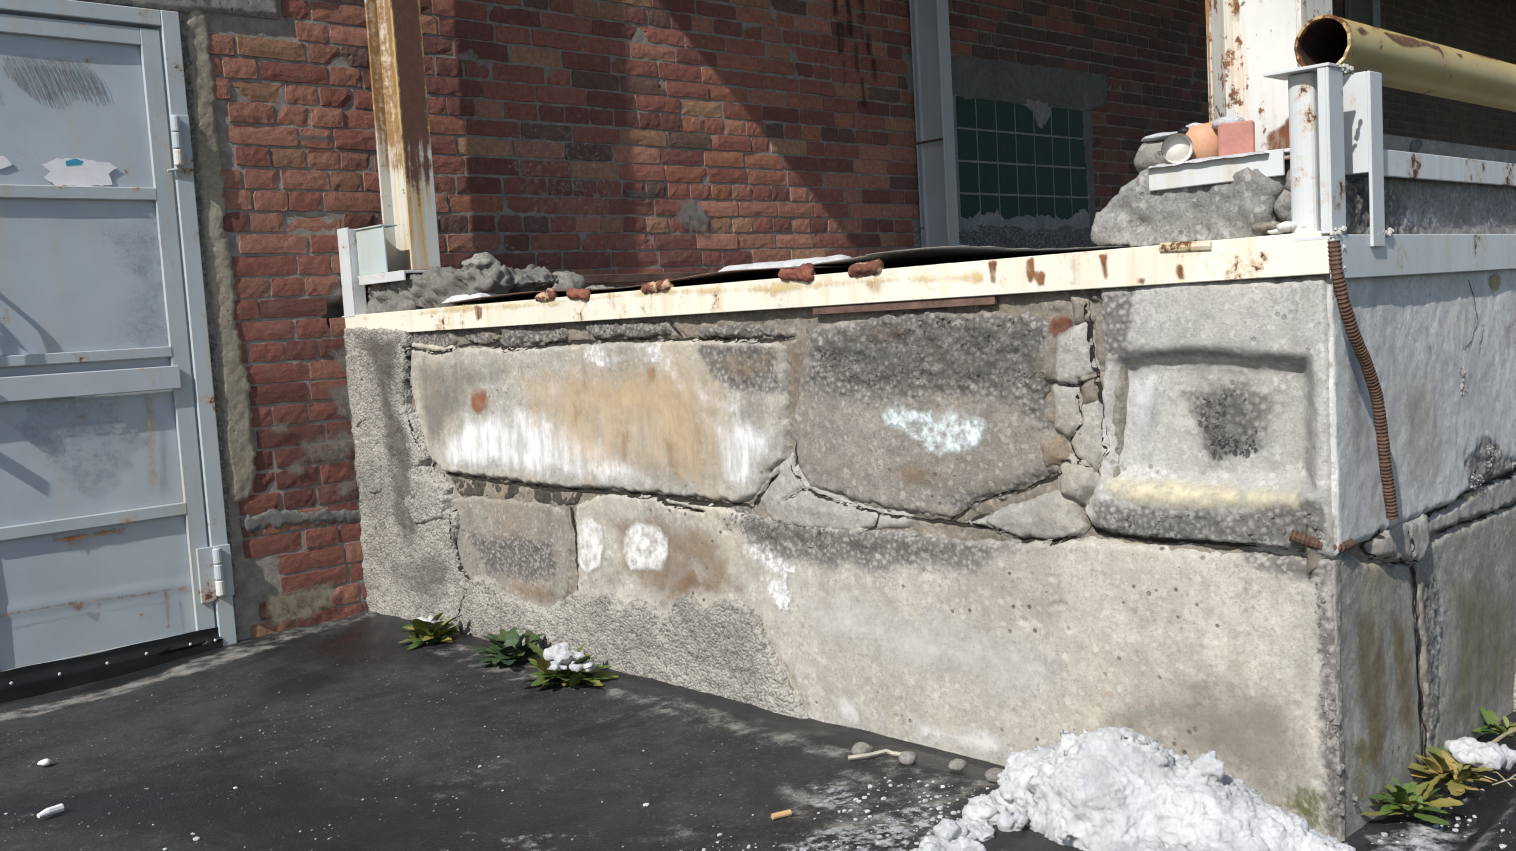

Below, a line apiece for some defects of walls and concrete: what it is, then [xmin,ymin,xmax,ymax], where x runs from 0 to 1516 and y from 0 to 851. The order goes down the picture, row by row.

corrosion [1354,20,1439,50]
corrosion [1267,118,1290,150]
corrosion [964,261,996,282]
corrosion [1027,258,1045,285]
corrosion [421,306,481,319]
spalling [1470,444,1516,489]
flaking render [343,327,809,719]